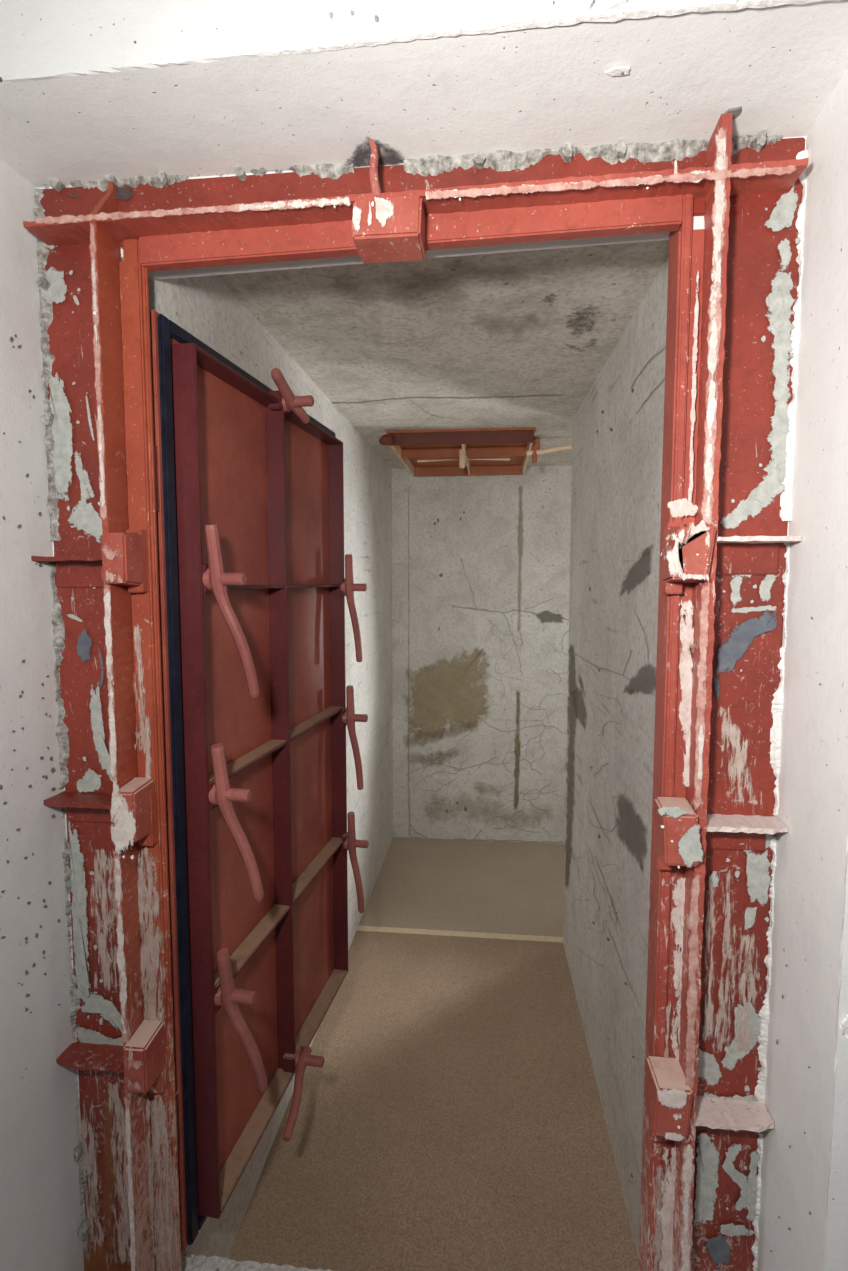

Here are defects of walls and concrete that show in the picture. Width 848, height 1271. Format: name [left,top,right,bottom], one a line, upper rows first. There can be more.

peeling [51,584,136,1046]
water stain [407,649,489,739]
crack [399,489,655,969]
water stain [565,645,586,886]
water stain [589,796,646,869]
water stain [621,545,653,595]
water stain [624,610,656,694]
peeling [678,600,694,787]
peeling [713,570,780,699]
peeling [658,806,773,1060]
peeling [124,1097,137,1271]
peeling [652,1001,762,1271]